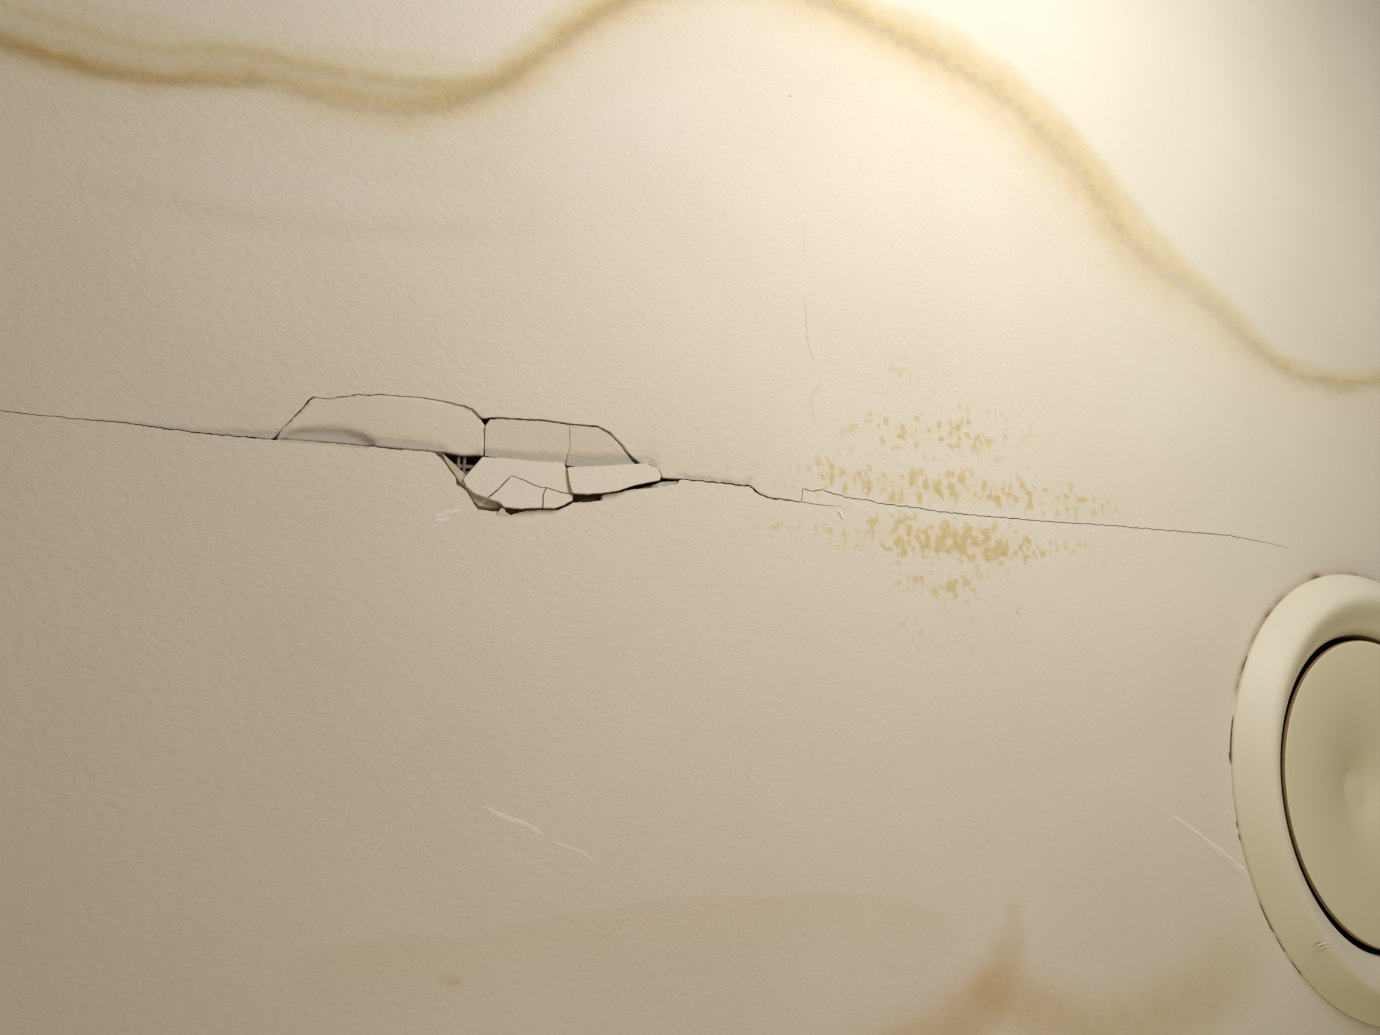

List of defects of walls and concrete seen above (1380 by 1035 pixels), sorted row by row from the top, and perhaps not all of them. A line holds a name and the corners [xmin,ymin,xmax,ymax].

leakage [0,32,266,85]
leakage [389,0,634,111]
crack [0,410,275,440]
flaking render [272,394,680,515]
leakage [821,465,965,502]
crack [677,479,1286,548]
leakage [983,482,1032,508]
leakage [867,520,1044,561]